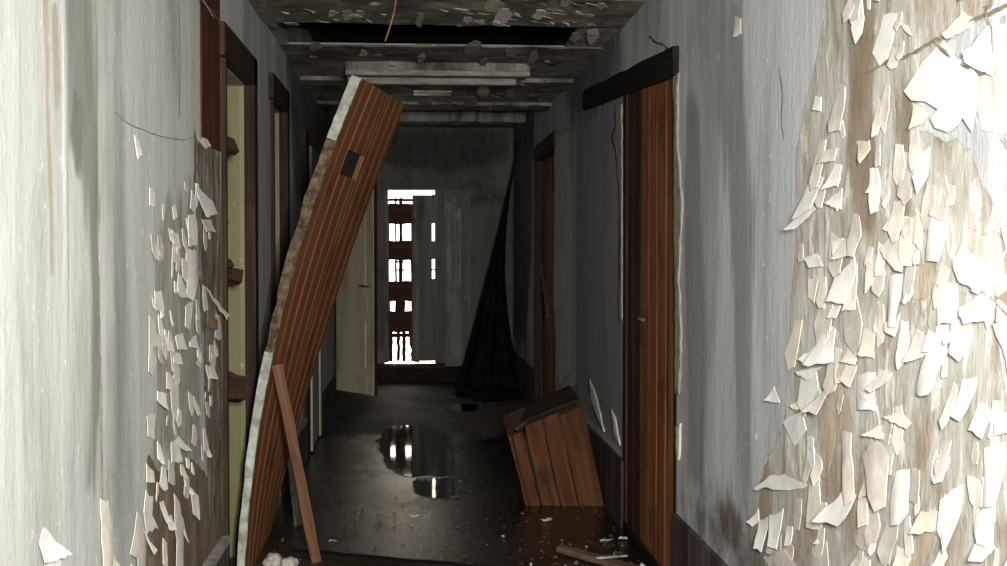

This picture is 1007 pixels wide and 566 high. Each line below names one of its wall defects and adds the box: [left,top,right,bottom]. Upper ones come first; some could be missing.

peeling [304,2,386,23]
peeling [439,0,608,45]
peeling [464,40,490,67]
peeling [419,78,547,109]
flaking render [721,0,1007,566]
spalling [100,132,230,566]
peeling [39,528,72,566]